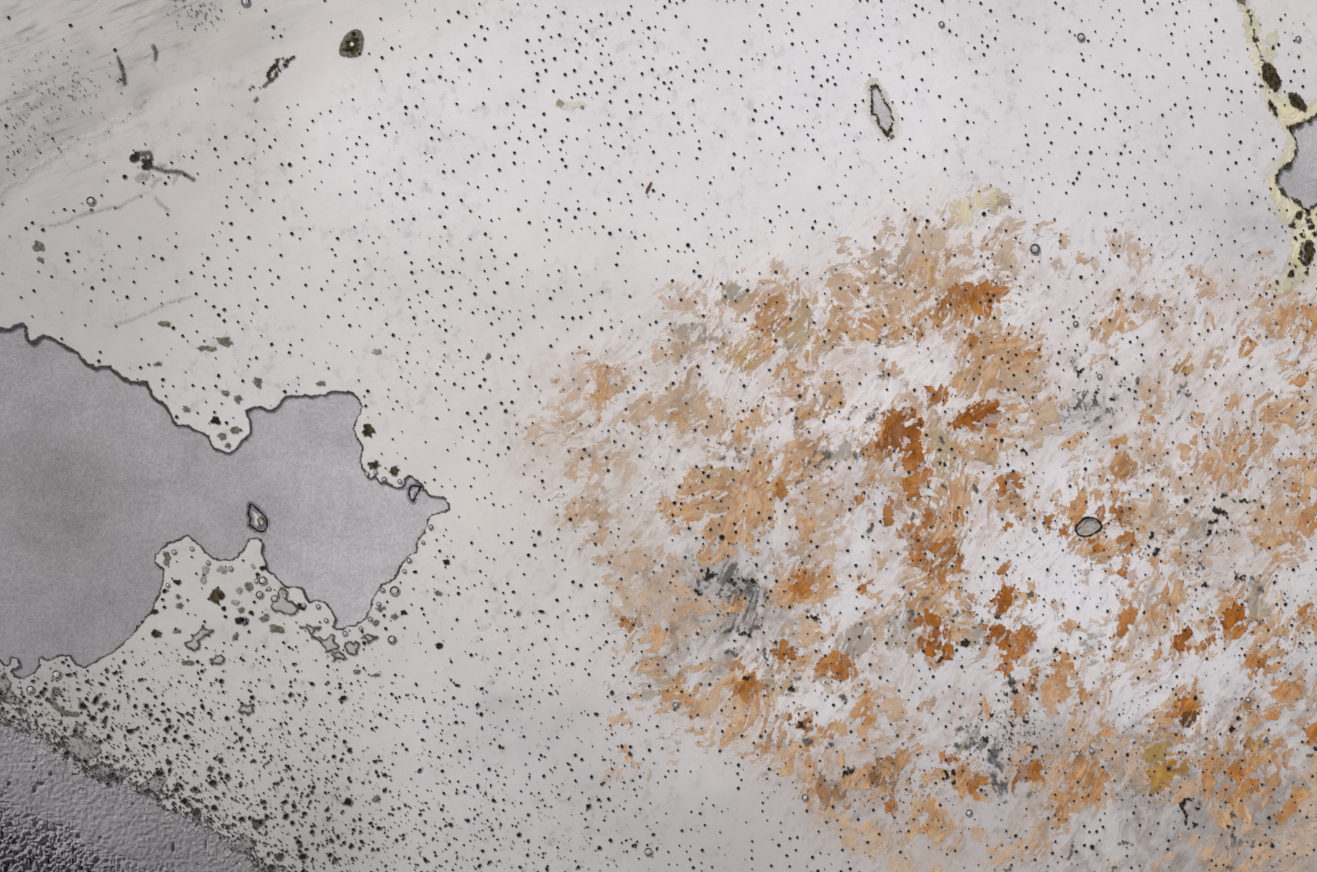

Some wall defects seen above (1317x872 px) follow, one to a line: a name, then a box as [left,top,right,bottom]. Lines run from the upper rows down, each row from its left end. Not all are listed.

spalling [339,29,364,57]
peeling [866,78,898,140]
crack [1236,0,1307,117]
peeling [1261,86,1317,227]
crack [1268,209,1317,294]
rust [523,183,1317,872]
spalling [1074,516,1103,537]
peeling [0,323,450,872]